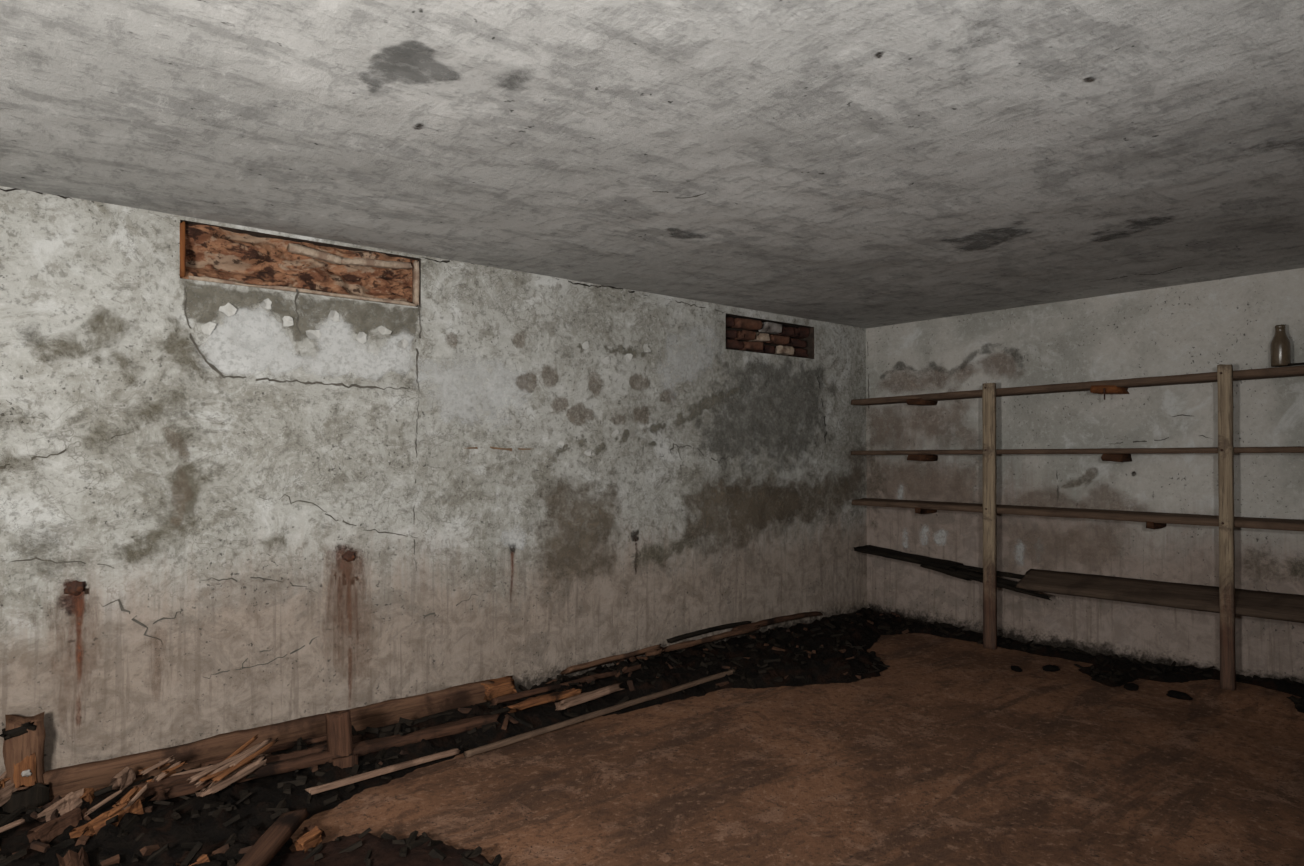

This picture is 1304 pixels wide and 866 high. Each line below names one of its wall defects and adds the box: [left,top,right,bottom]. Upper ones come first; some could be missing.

flaking render [183,282,421,349]
leakage [636,360,974,563]
leakage [539,480,617,589]
corrosion [60,581,84,675]
corrosion [335,545,357,627]